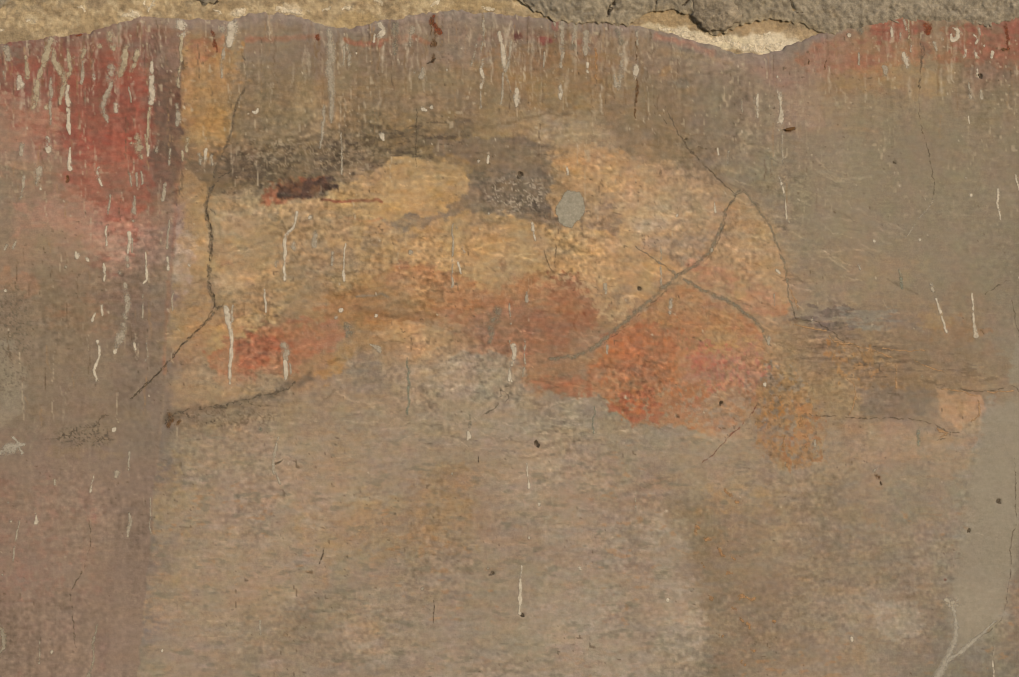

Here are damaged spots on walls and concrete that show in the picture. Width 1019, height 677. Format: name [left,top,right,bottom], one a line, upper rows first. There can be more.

water stain [16,37,95,153]
water stain [98,31,140,123]
water stain [130,61,213,165]
water stain [176,19,187,88]
flaking render [0,0,551,44]
flaking render [621,8,822,55]
water stain [113,171,148,357]
crack [130,89,245,399]
crack [549,113,851,361]
crack [934,604,997,677]